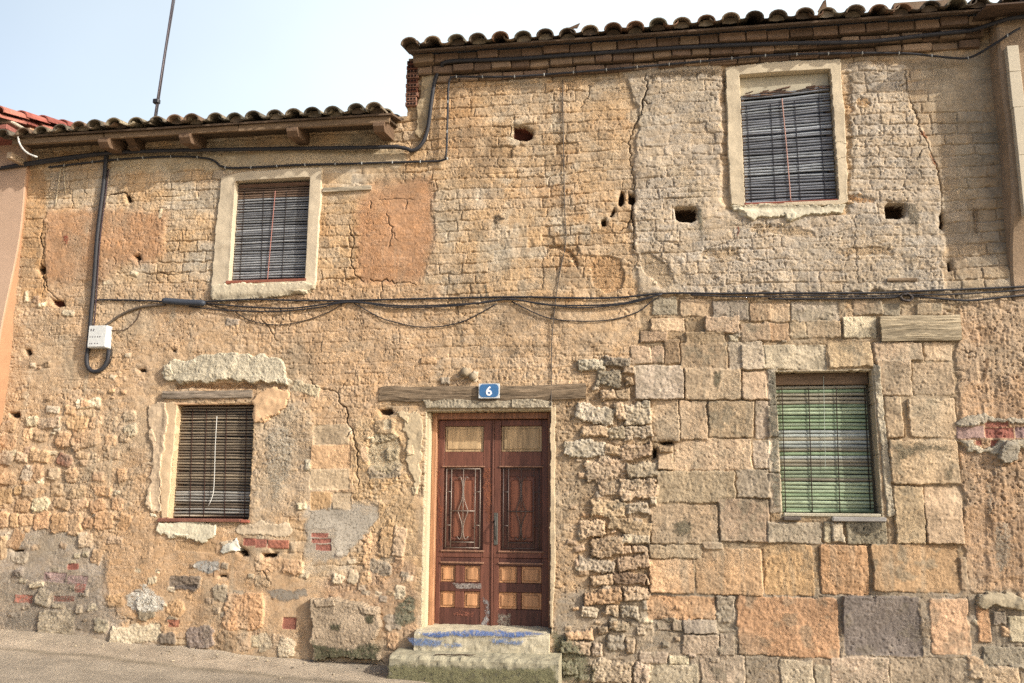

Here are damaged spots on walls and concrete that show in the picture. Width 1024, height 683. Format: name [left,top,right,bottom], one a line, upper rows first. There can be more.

crack [621,76,649,250]
flaking render [145,402,293,554]
crack [310,379,360,485]
flaking render [955,413,1024,427]
flaking render [956,439,1024,455]